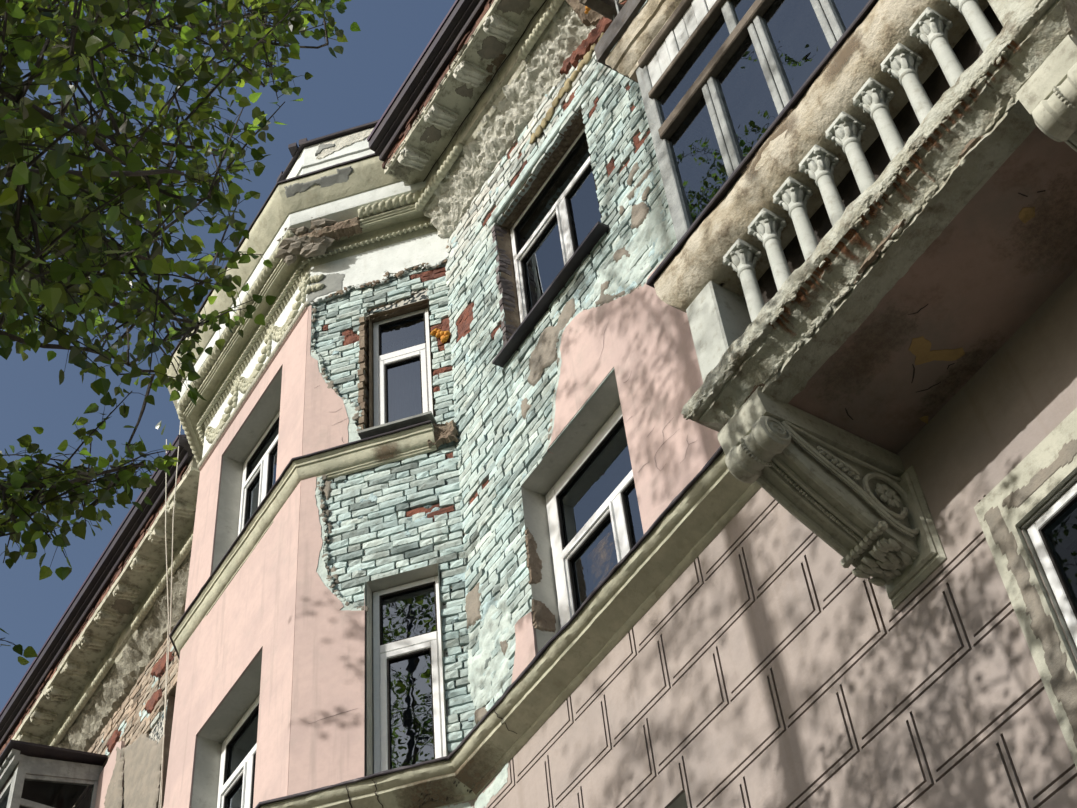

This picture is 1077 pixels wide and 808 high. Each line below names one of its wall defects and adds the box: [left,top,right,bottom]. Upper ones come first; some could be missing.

spalling [1026,0,1049,22]
spalling [274,217,337,266]
spalling [728,96,1016,421]
corrosion [769,40,1020,334]
spalling [837,39,1012,244]
flaking render [311,17,677,753]
spalling [683,260,826,420]
peeling [984,439,1077,748]
flaking render [88,631,179,769]
crack [346,779,383,808]
peeling [440,763,508,808]